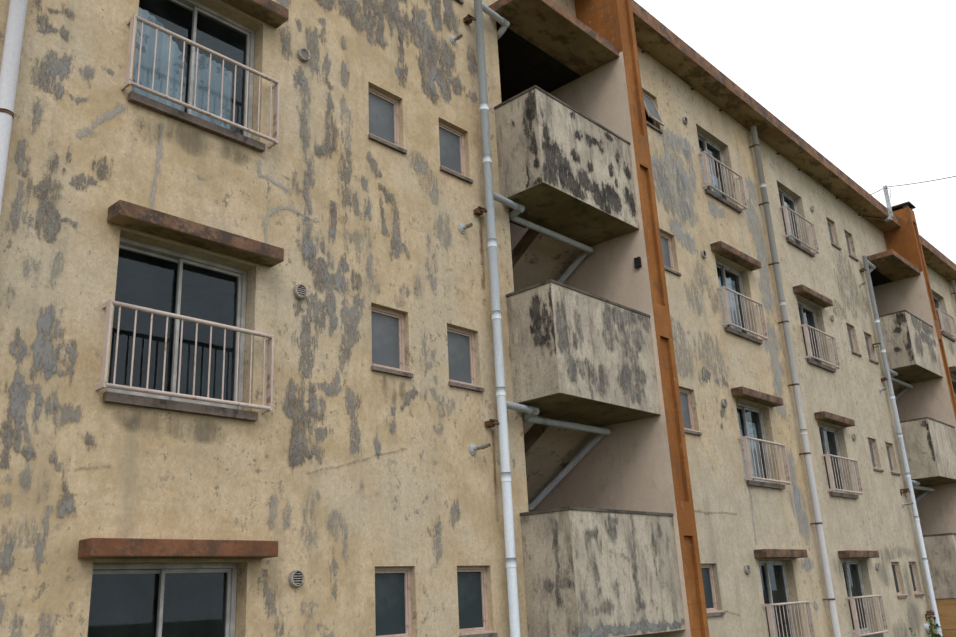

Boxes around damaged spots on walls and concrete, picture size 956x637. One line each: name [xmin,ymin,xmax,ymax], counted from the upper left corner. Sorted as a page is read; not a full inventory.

leakage [509,90,636,221]
leakage [526,284,649,403]
leakage [543,513,619,615]
leakage [622,514,645,611]